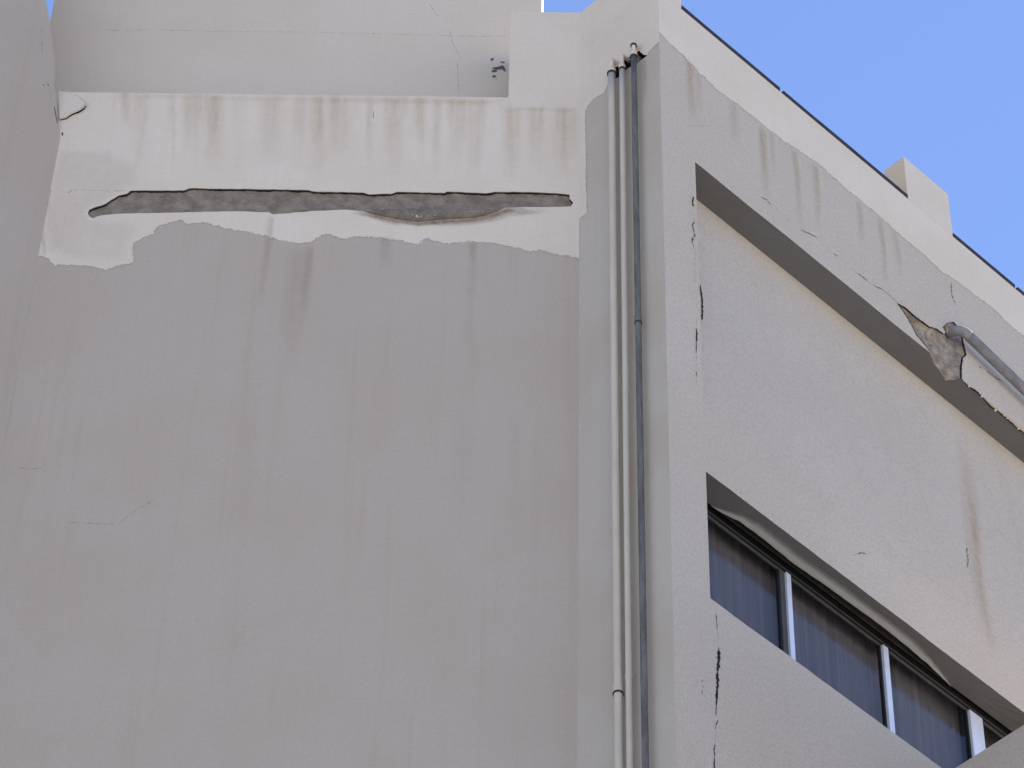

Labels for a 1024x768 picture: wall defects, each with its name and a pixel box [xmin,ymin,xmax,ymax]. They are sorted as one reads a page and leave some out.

spalling [88,188,573,222]
crack [694,280,704,383]
spalling [897,303,1024,434]
crack [702,615,721,768]